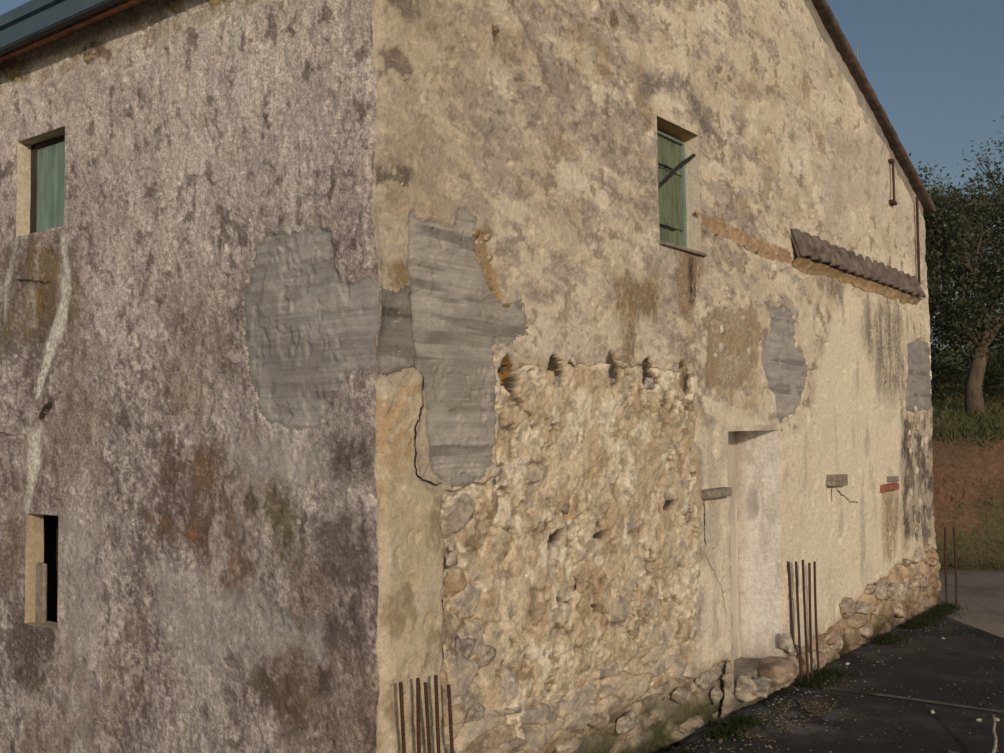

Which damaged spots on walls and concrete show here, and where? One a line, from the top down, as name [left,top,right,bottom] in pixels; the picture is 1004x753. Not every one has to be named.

flaking render [472,227,510,308]
leakage [866,313,900,392]
crack [0,401,52,436]
crack [414,373,443,486]
flaking render [399,356,958,753]